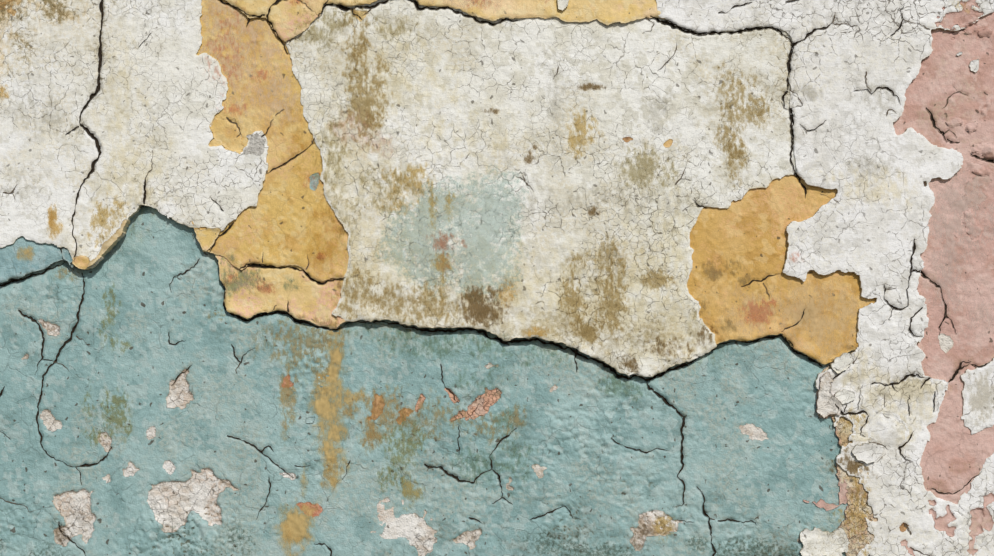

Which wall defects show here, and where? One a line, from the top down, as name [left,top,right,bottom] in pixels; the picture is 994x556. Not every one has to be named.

peeling [0,0,377,329]
crack [220,0,518,54]
crack [643,2,859,203]
crack [0,0,112,485]
peeling [286,0,994,556]
crack [884,238,956,338]
spalling [166,369,194,410]
corrosion [314,333,356,484]
crack [221,254,990,556]
spalling [52,489,97,547]
spalling [147,460,239,533]
corrosion [281,505,313,542]